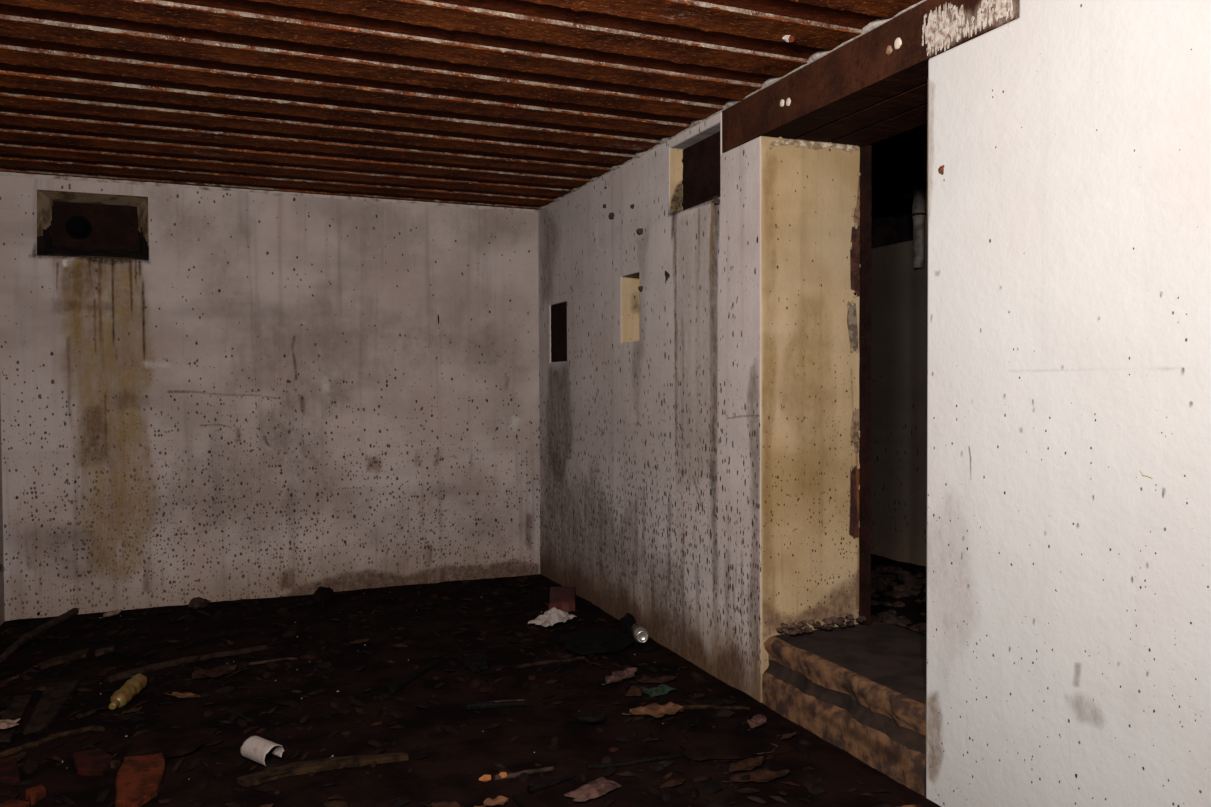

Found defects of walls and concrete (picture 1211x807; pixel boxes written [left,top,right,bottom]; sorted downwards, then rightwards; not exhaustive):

water stain [284,562,743,689]